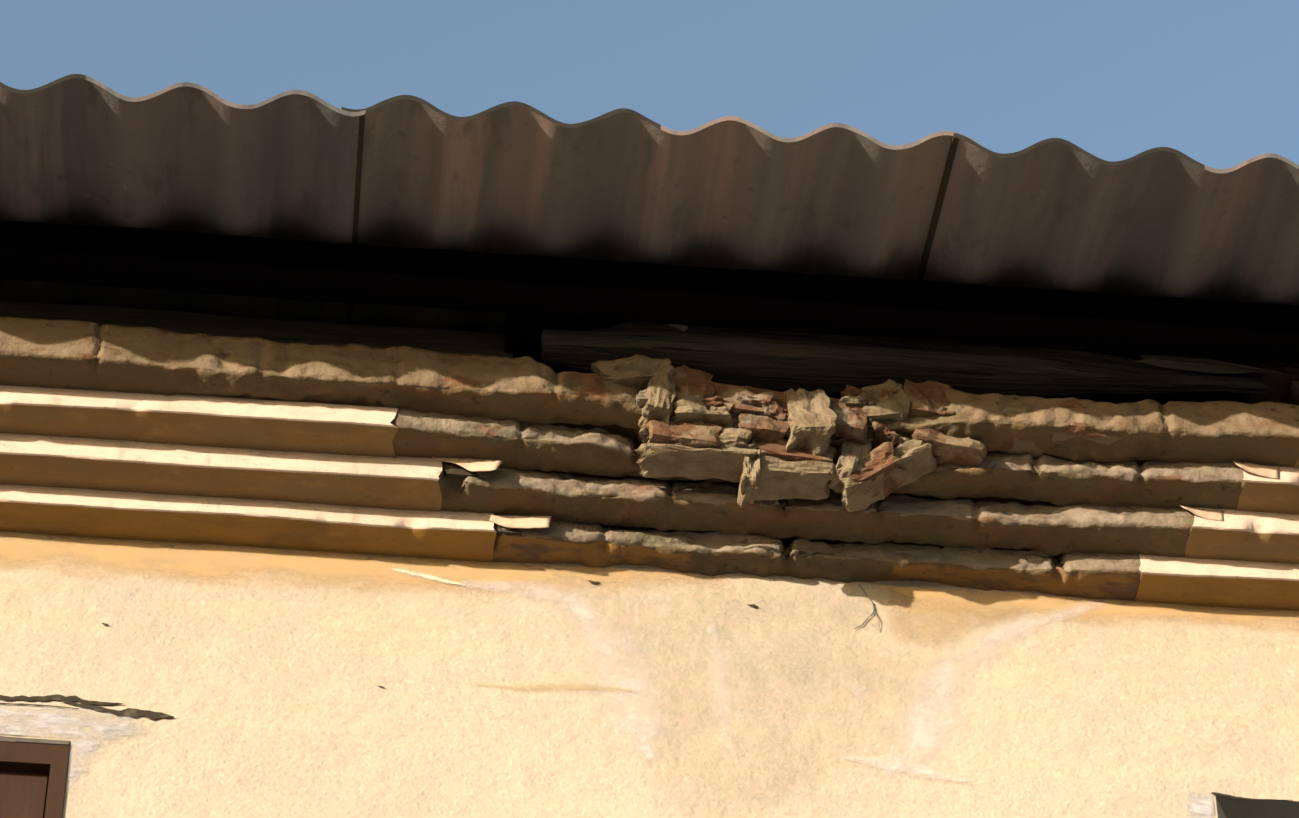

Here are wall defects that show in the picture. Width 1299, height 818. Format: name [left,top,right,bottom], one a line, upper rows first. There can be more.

spalling [0,317,1299,601]
crack [854,584,880,631]
crack [0,694,174,720]